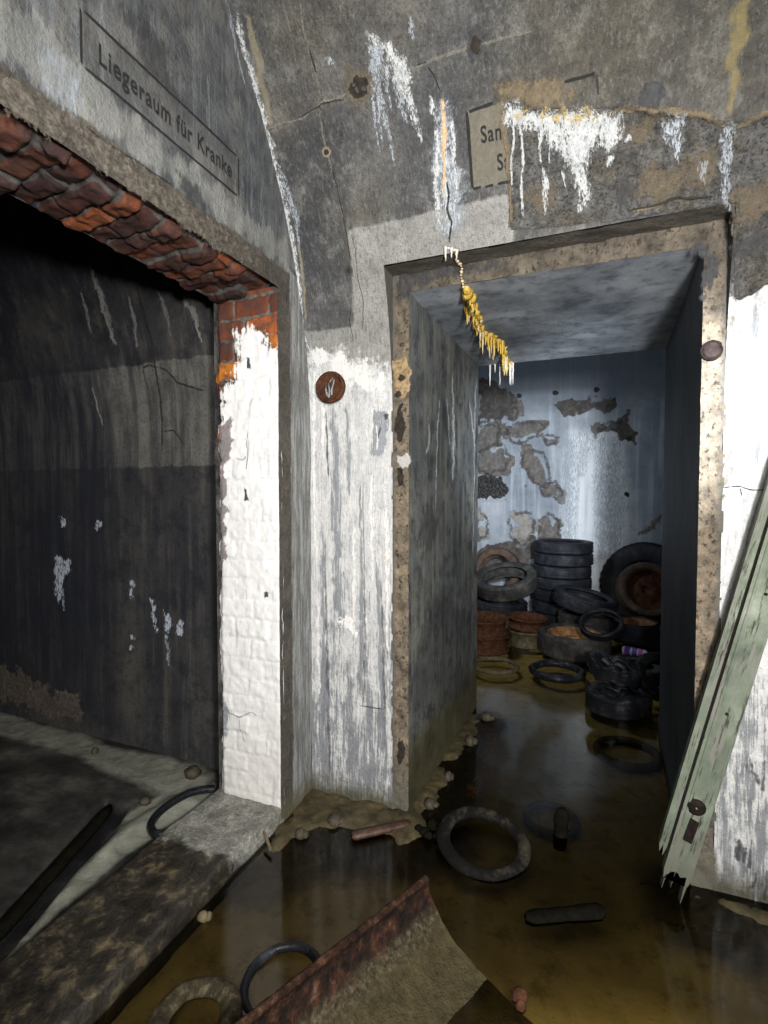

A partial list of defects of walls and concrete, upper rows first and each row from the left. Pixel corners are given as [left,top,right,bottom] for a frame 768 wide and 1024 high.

crack [266,3,346,130]
efflorescence [366,31,465,241]
damp [492,75,631,213]
efflorescence [662,114,687,163]
damp [697,0,749,211]
crack [332,171,364,338]
flaking render [477,378,567,567]
flaking render [553,387,638,445]
damp [320,407,386,756]